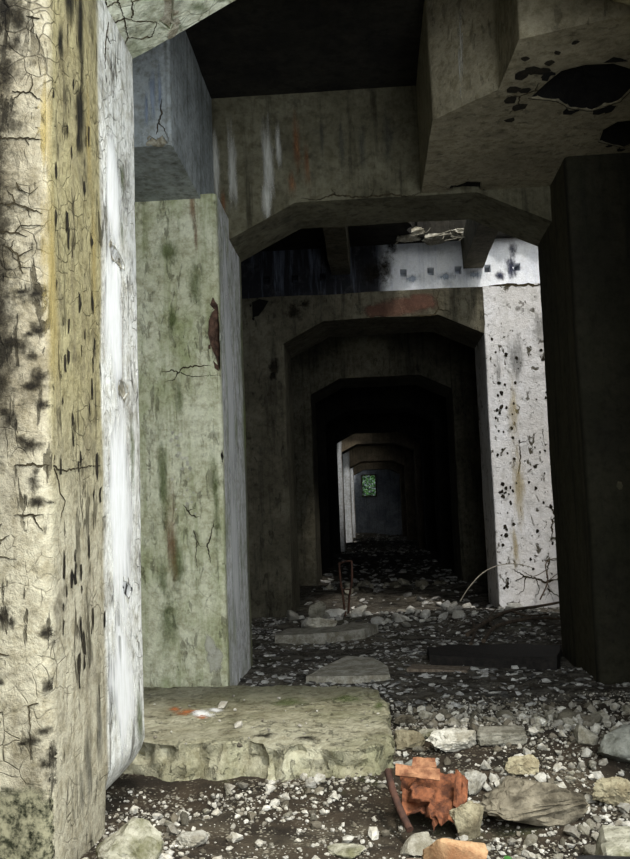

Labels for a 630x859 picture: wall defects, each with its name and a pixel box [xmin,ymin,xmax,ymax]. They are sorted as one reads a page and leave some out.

crack [104,0,157,69]
damp [0,62,13,84]
crack [12,75,42,101]
spalling [504,51,630,122]
crack [0,136,42,144]
spalling [599,120,630,152]
crack [0,182,42,274]
damp [6,236,56,390]
crack [163,365,215,382]
crack [0,456,100,559]
crack [514,506,559,601]
crack [28,703,39,759]